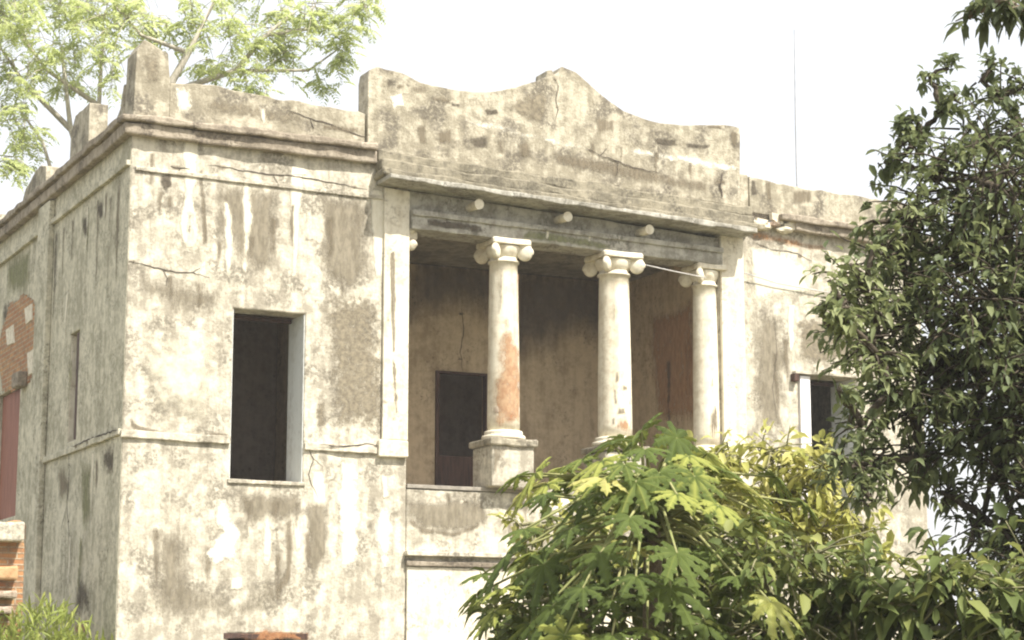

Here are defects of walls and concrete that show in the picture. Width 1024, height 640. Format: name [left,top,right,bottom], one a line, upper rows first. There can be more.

crack [287,110,365,137]
crack [588,148,658,175]
spalling [0,294,35,392]
damp [53,188,120,338]
crack [130,261,210,284]
damp [146,142,277,309]
damp [290,166,307,276]
damp [317,189,384,426]
damp [749,233,862,425]
damp [154,463,361,613]
damp [409,494,487,536]